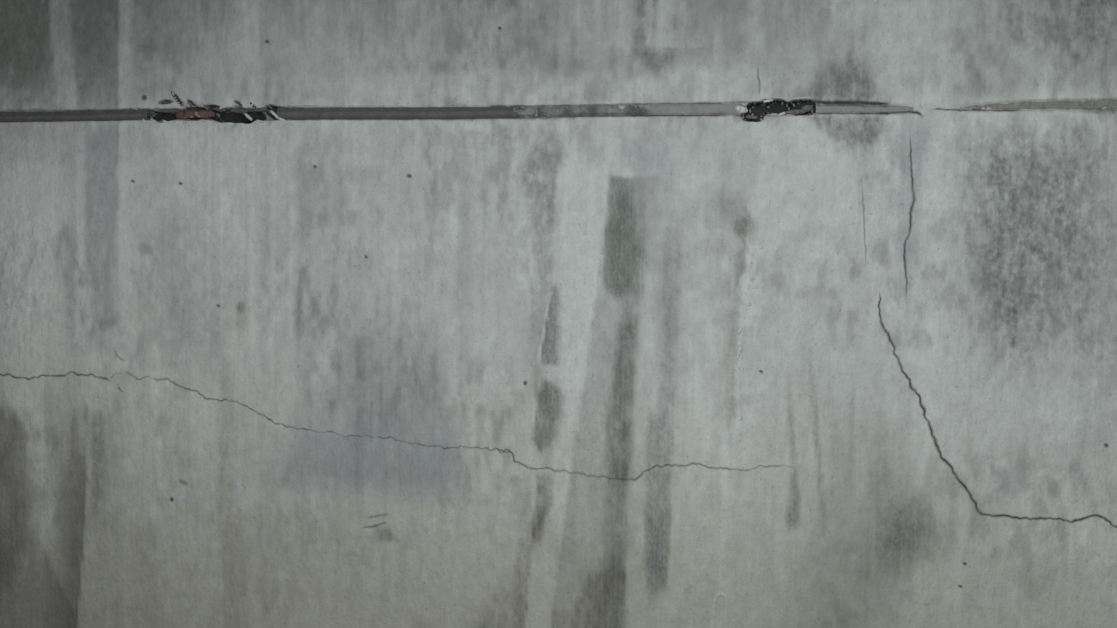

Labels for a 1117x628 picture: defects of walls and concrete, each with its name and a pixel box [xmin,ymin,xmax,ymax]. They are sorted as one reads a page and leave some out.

rust [176,110,215,119]
spalling [142,92,287,129]
spalling [735,99,816,122]
crack [814,101,1015,115]
crack [904,152,914,280]
crack [878,297,1117,527]